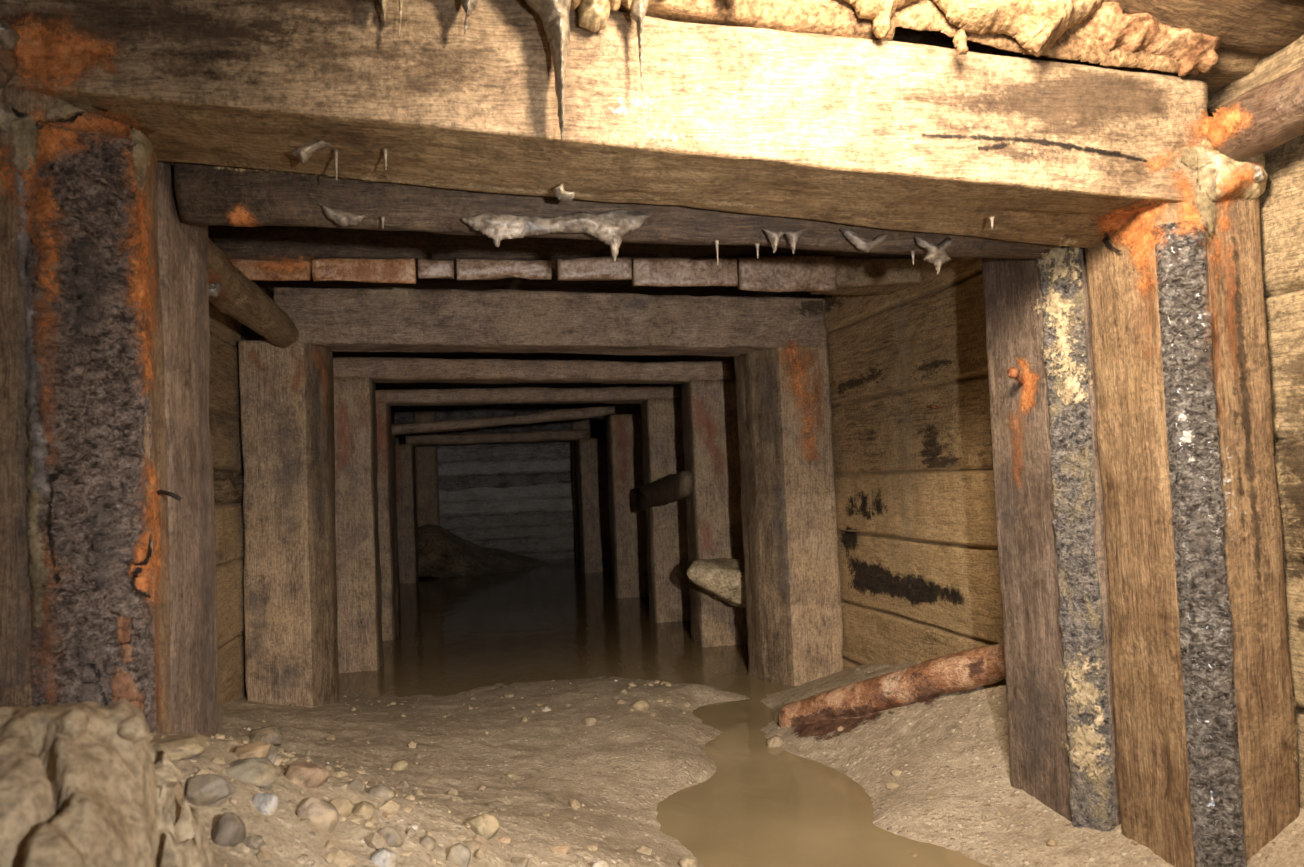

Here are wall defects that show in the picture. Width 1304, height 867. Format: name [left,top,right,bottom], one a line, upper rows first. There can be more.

rust [12,12,115,95]
damp [2,0,280,78]
crack [922,133,1147,162]
rust [1193,107,1252,147]
rust [0,112,157,391]
rust [1097,157,1263,366]
rust [1010,359,1039,485]
rust [145,460,164,603]
damp [840,488,964,606]
damp [1278,431,1304,580]